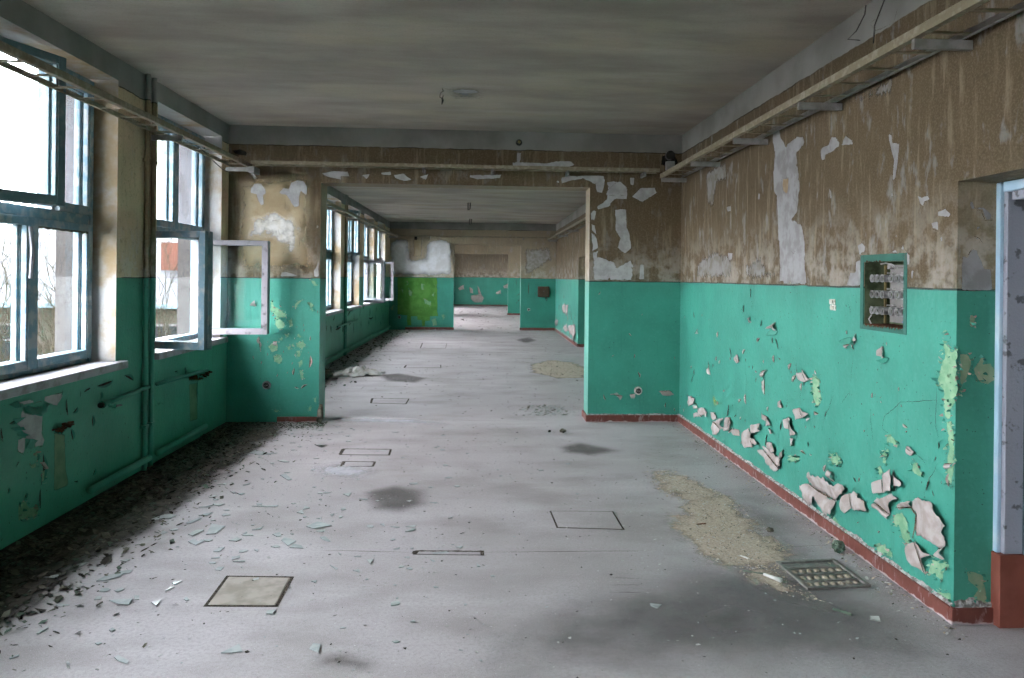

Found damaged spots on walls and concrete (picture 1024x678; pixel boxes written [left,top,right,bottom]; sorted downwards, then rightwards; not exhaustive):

flaking render [239,179,319,286]
flaking render [322,170,349,180]
flaking render [363,171,428,181]
flaking render [513,153,656,280]
peeling [253,299,318,389]
flaking render [391,240,451,326]
peeling [458,285,484,303]
peeling [555,303,577,343]
flaking render [588,130,995,608]
flaking render [1,381,113,509]